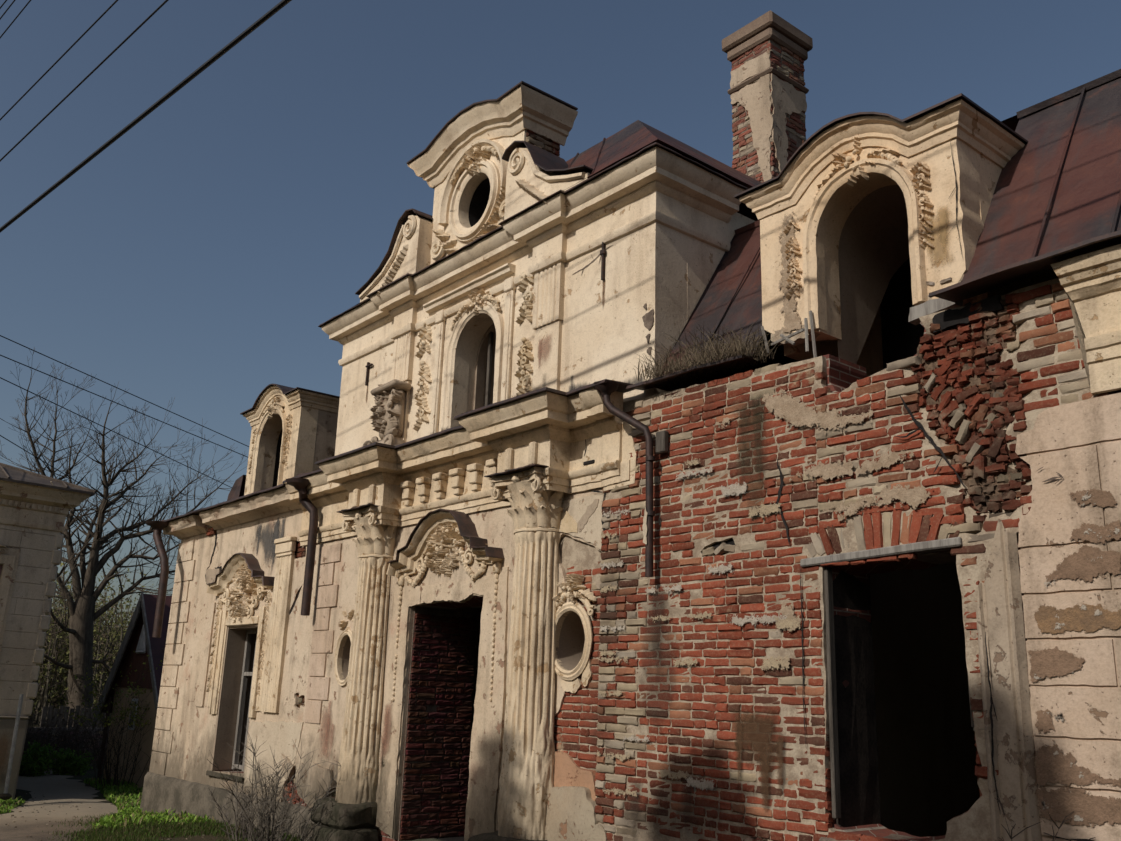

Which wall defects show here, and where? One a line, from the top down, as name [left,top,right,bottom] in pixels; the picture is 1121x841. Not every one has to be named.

crack [948,141,963,257]
crack [896,395,964,486]
flaking render [554,212,1121,841]
leakage [735,712,783,810]
crack [985,632,1000,811]